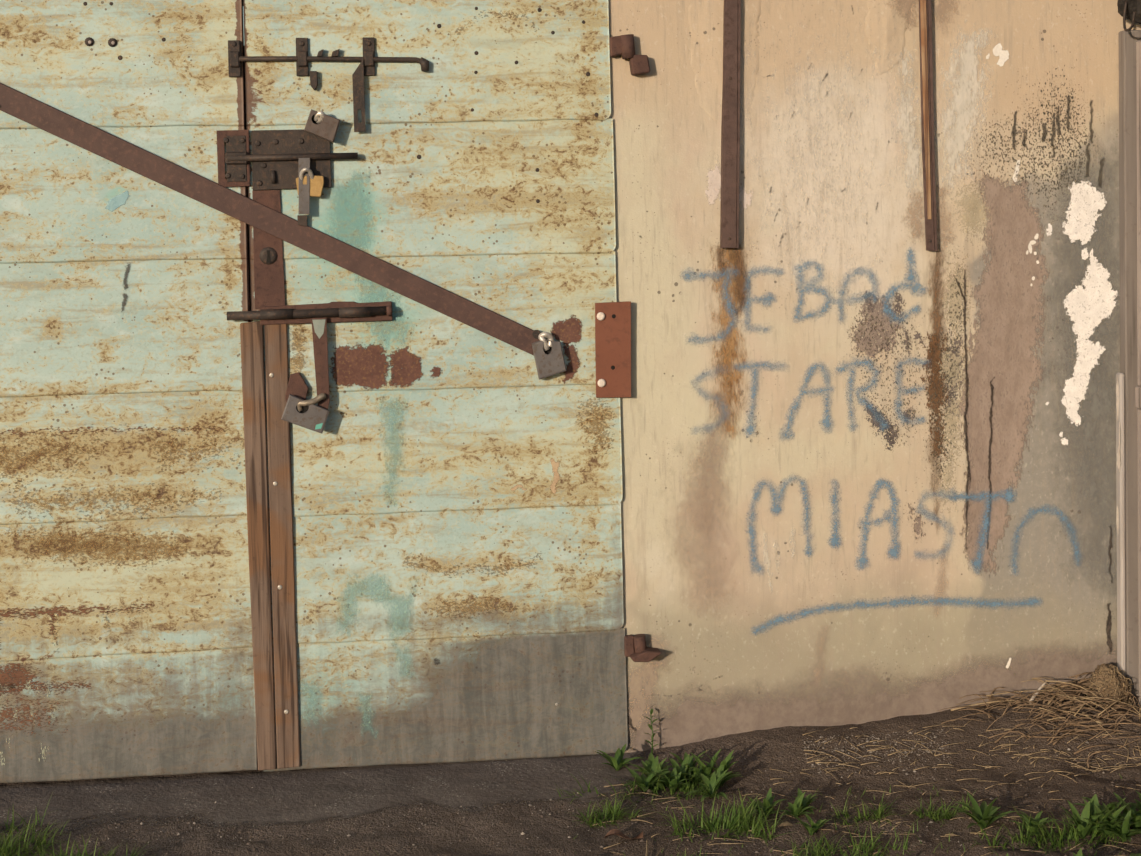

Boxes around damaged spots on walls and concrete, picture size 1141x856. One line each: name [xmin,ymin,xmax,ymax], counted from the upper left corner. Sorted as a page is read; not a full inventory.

flaking render [986,43,1009,67]
corrosion [0,424,225,435]
corrosion [330,344,442,390]
corrosion [551,315,582,384]
corrosion [713,248,750,435]
corrosion [920,251,949,492]
crack [953,271,995,549]
water stain [851,33,1116,573]
peeling [1026,180,1120,445]
corrosion [0,604,152,640]
corrosion [0,658,91,735]